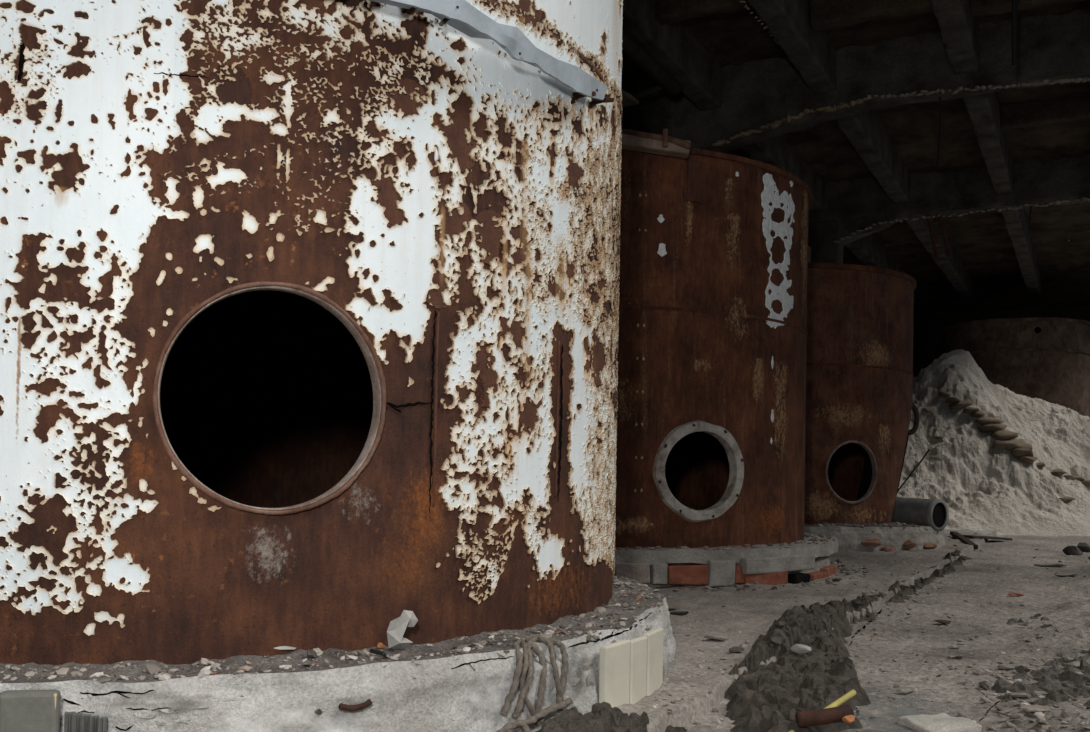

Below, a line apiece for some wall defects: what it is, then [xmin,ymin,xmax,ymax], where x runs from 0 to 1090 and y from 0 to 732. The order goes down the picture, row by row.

rust [205,65,252,108]
rust [384,78,427,119]
rust [442,118,480,173]
rust [371,173,406,227]
rust [434,198,533,278]
peeling [761,173,795,329]
peeling [0,0,623,636]
rust [426,271,453,309]
rust [497,308,527,349]
crack [386,311,438,512]
rust [455,353,505,415]
crack [557,345,565,502]